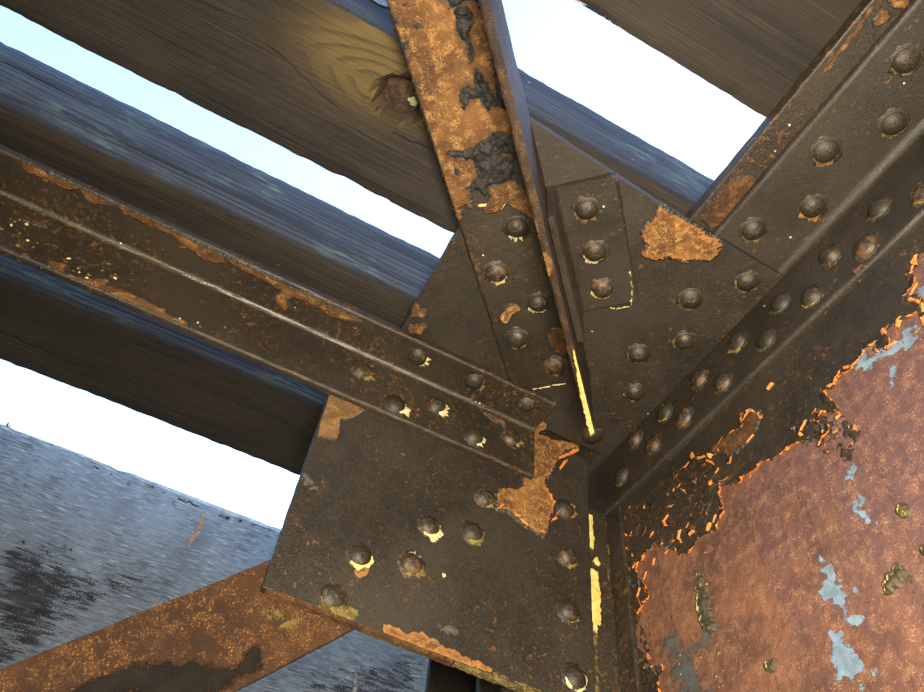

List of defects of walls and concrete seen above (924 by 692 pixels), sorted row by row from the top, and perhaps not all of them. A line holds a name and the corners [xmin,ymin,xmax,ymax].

corrosion [386,0,553,277]
corrosion [18,159,364,328]
corrosion [639,175,757,264]
corrosion [317,394,365,441]
corrosion [494,420,581,539]
corrosion [634,247,924,692]
peeling [793,410,860,461]
peeling [895,502,912,519]
peeling [623,446,744,692]
peeling [881,562,915,596]
peeling [763,658,778,673]